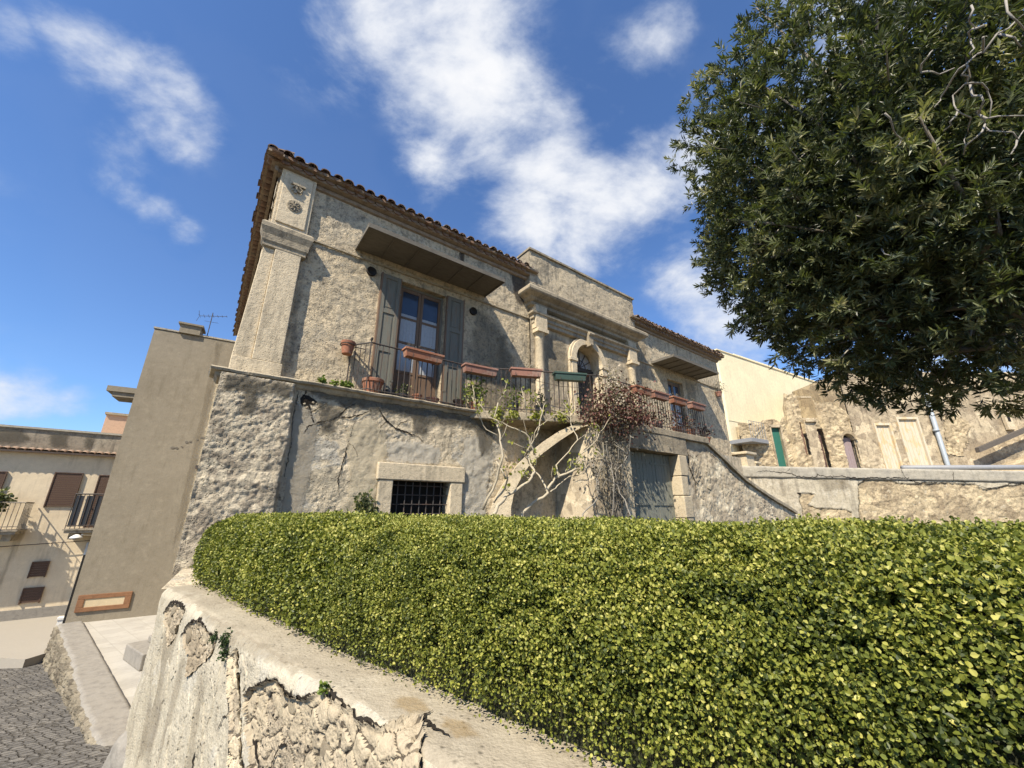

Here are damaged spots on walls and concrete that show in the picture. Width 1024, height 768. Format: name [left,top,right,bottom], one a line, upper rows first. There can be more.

crack [284,390,422,492]
spalling [151,603,425,768]